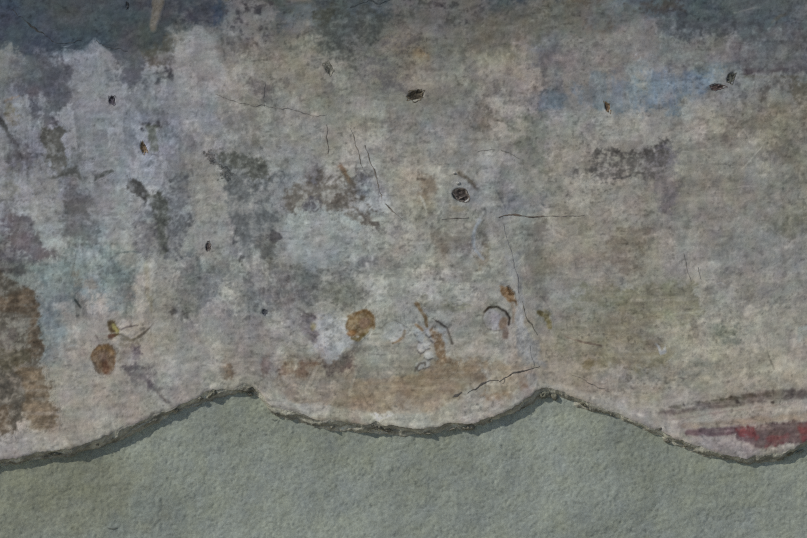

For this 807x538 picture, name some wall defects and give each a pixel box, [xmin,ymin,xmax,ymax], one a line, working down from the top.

crack [499,214,584,335]
crack [453,353,540,397]
spalling [0,384,807,466]